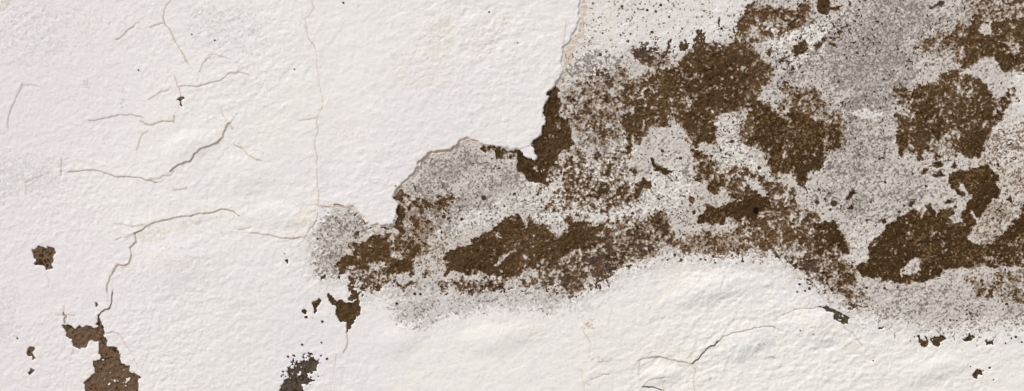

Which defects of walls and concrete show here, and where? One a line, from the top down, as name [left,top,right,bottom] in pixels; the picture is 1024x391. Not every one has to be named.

crack [7,83,39,128]
crack [24,0,395,366]
peeling [302,0,1024,348]
spalling [32,246,56,270]
spalling [62,303,141,391]
peeling [279,353,319,391]